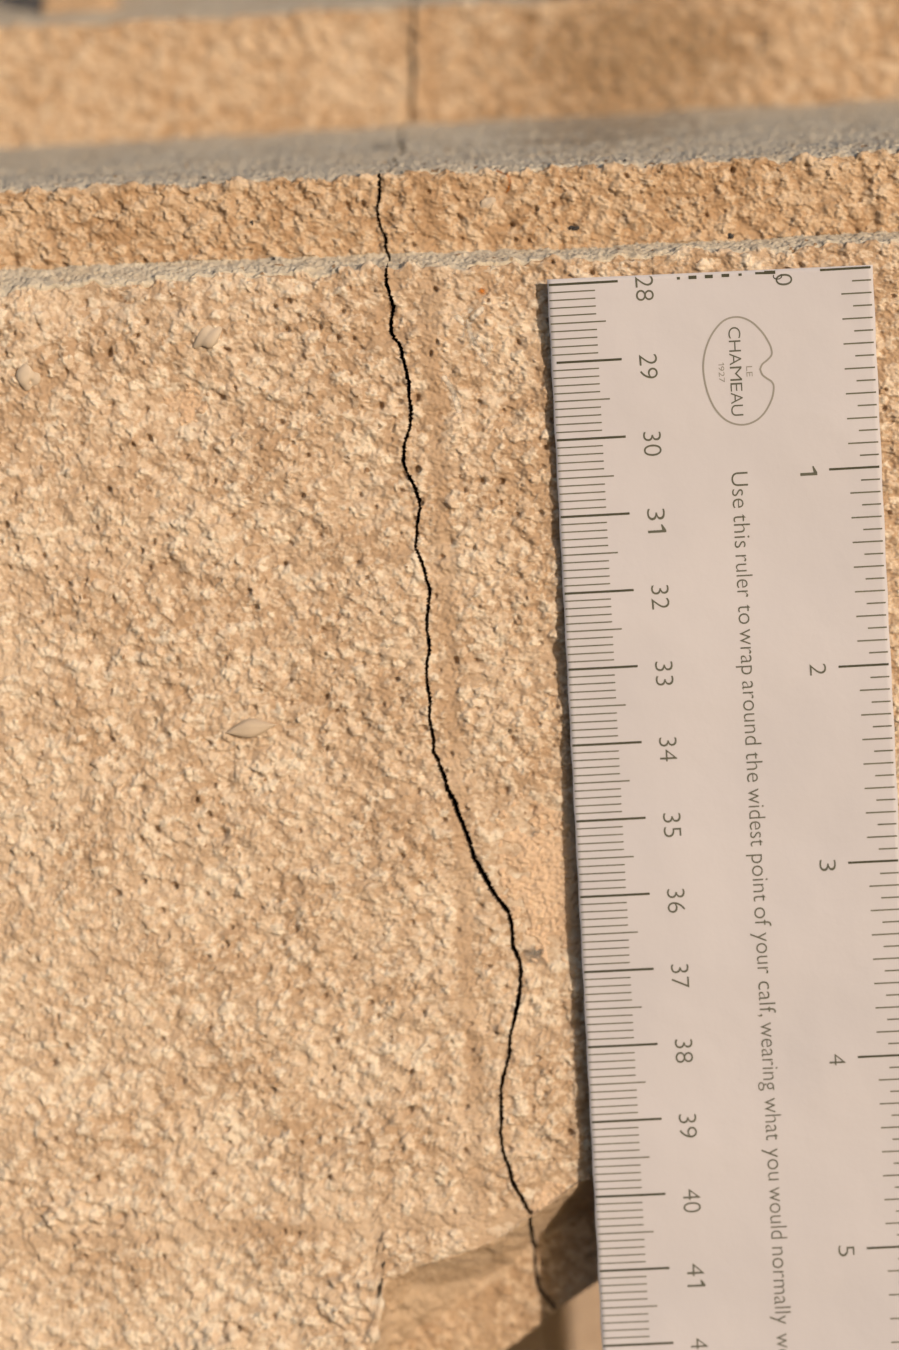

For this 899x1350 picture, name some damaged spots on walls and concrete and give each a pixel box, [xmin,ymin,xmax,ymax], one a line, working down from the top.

crack [375,0,559,1350]
spalling [480,789,582,978]
spalling [528,1169,592,1215]